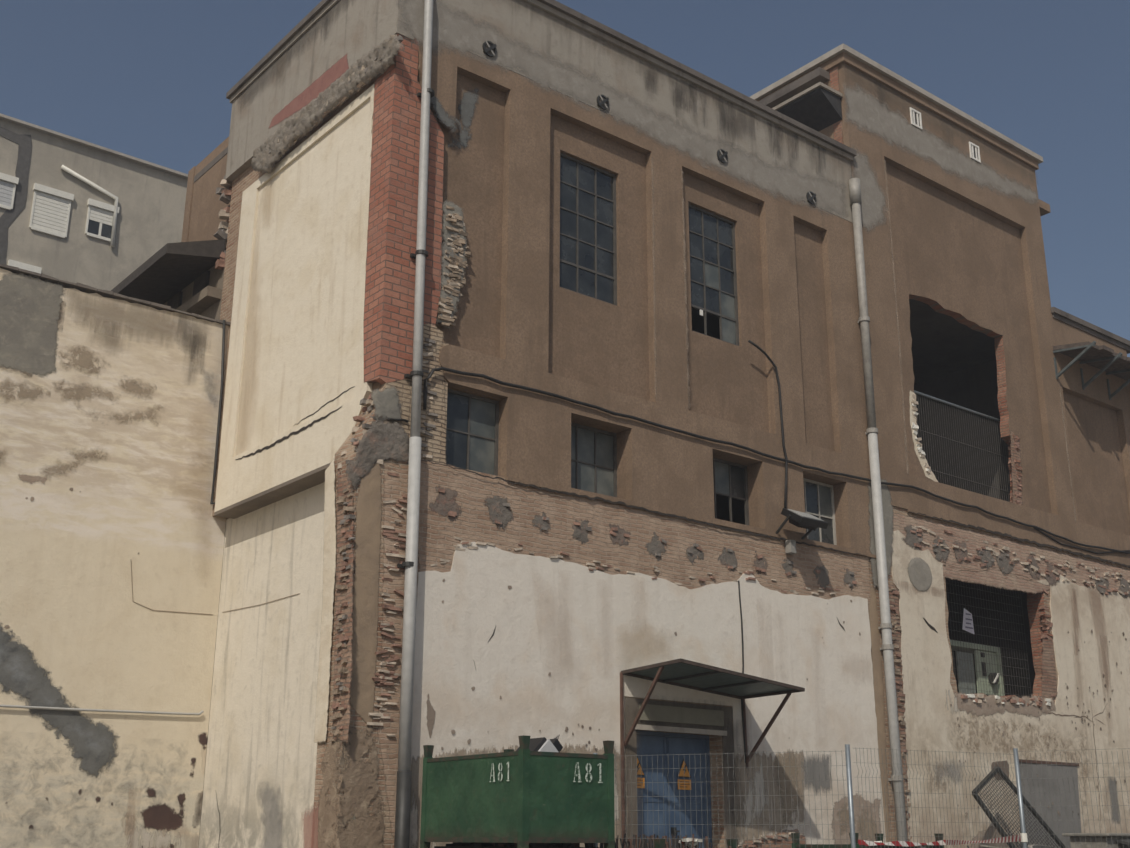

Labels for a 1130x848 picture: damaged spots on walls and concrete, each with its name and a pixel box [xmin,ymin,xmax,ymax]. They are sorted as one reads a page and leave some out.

spalling [251,34,403,174]
spalling [901,380,938,482]
spalling [1008,429,1023,505]
spalling [330,201,871,848]
spalling [892,513,1130,736]
flaking render [141,788,186,848]
flaking render [832,794,881,844]
spalling [985,761,1025,806]